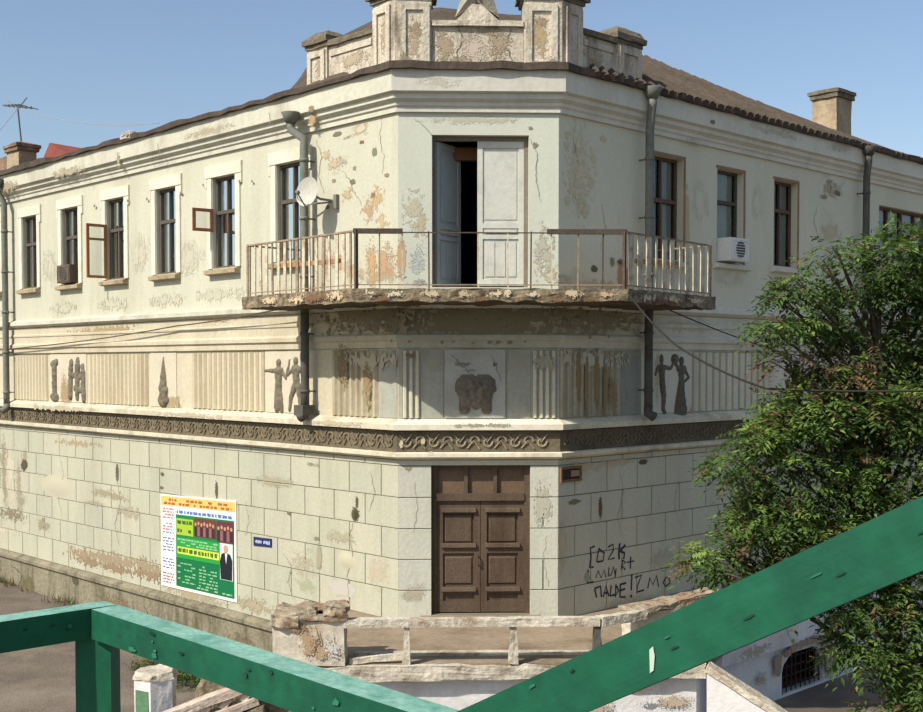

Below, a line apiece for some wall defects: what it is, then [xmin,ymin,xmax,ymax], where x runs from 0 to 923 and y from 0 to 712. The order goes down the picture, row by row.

peeling [457,29,493,62]
peeling [532,12,550,60]
peeling [333,123,377,156]
peeling [321,149,356,202]
corrosion [321,236,407,302]